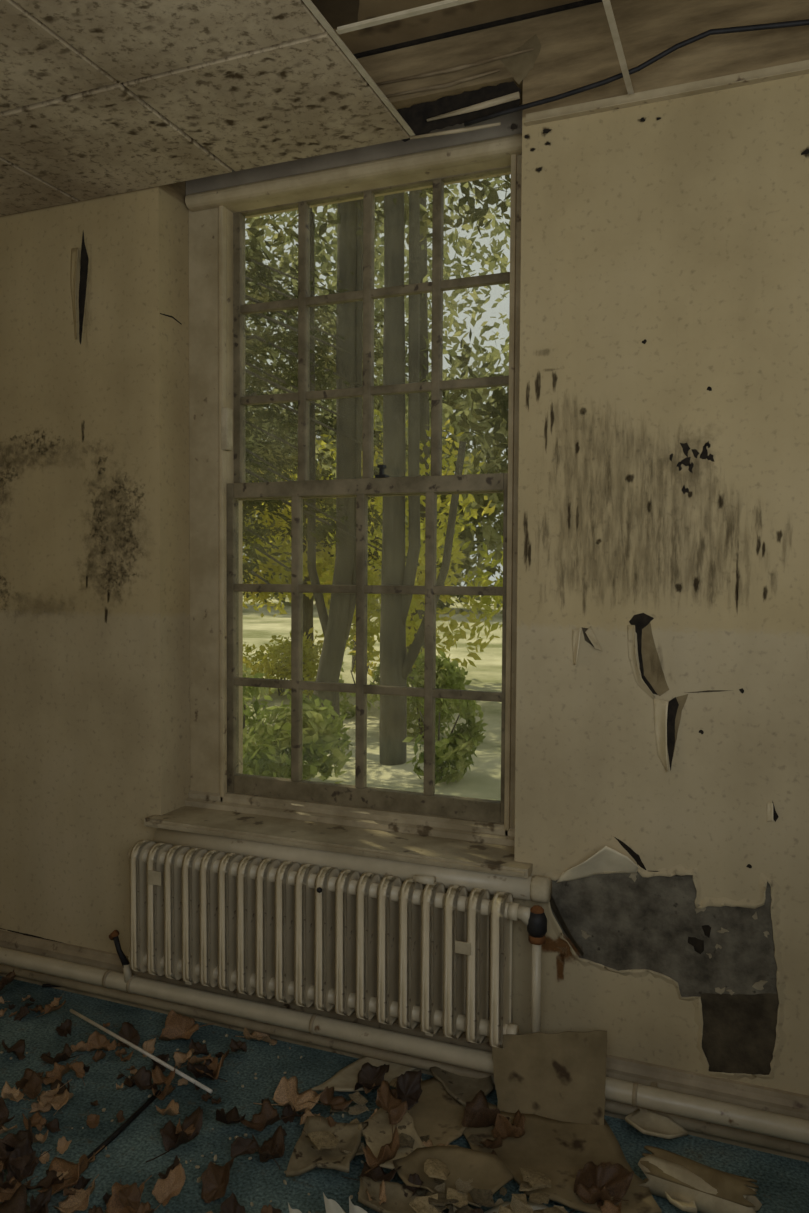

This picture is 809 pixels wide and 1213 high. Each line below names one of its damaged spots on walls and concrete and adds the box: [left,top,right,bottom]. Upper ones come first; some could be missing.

hole [376,34,541,142]
crack [70,232,89,344]
water stain [526,373,557,408]
water stain [669,441,715,473]
peeling [628,613,744,773]
peeling [542,837,787,1080]